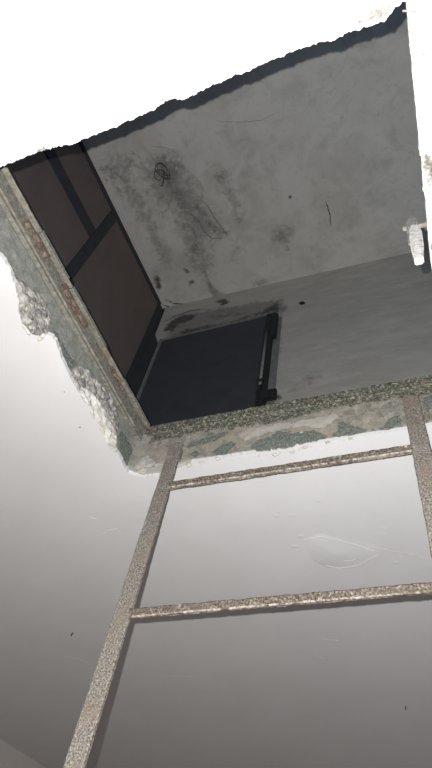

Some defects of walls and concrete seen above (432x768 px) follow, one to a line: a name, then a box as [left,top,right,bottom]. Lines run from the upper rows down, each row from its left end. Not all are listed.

spalling [5,263,164,475]